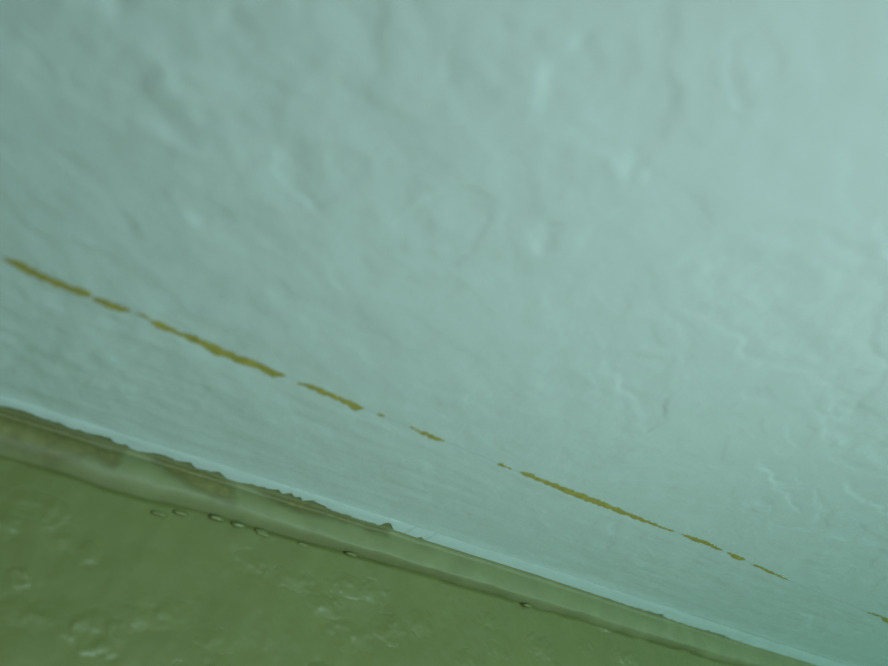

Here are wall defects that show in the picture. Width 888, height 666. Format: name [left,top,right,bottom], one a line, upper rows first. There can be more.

crack [0,254,888,623]